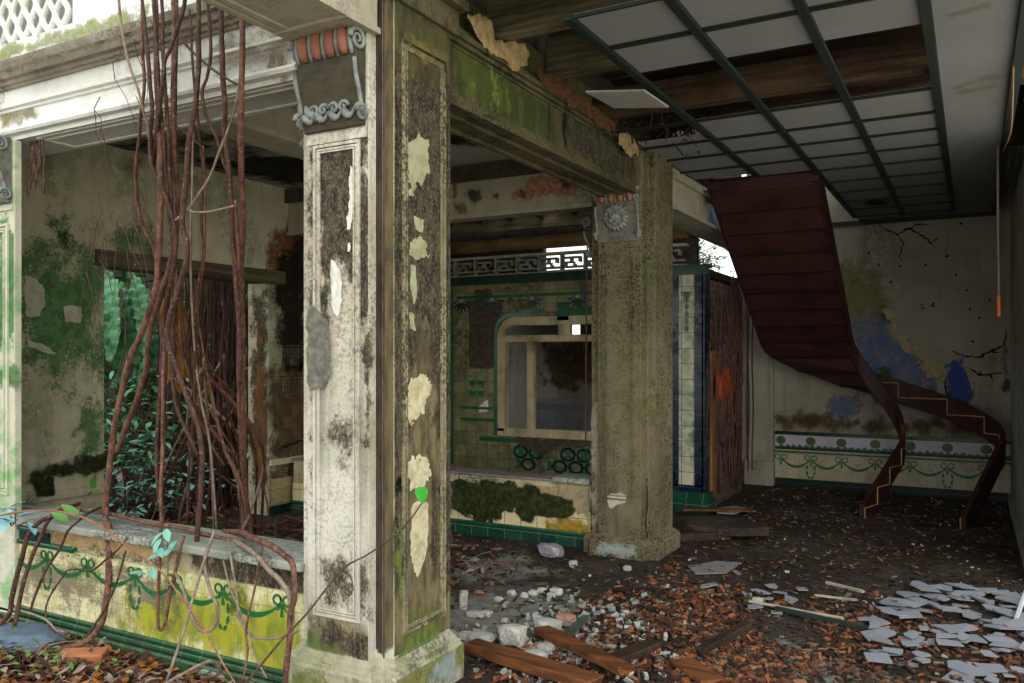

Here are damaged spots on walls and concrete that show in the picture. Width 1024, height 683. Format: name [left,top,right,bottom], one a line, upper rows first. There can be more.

spalling [467,13,639,158]
peeling [512,174,577,202]
crack [879,223,939,261]
flaking render [23,275,45,318]
leakage [248,121,374,498]
peeling [27,340,56,355]
spalling [306,306,331,391]
crack [917,330,1007,394]
flaking render [406,374,432,425]
leakage [776,410,978,437]
flaking render [408,454,432,577]
leakage [189,554,304,613]